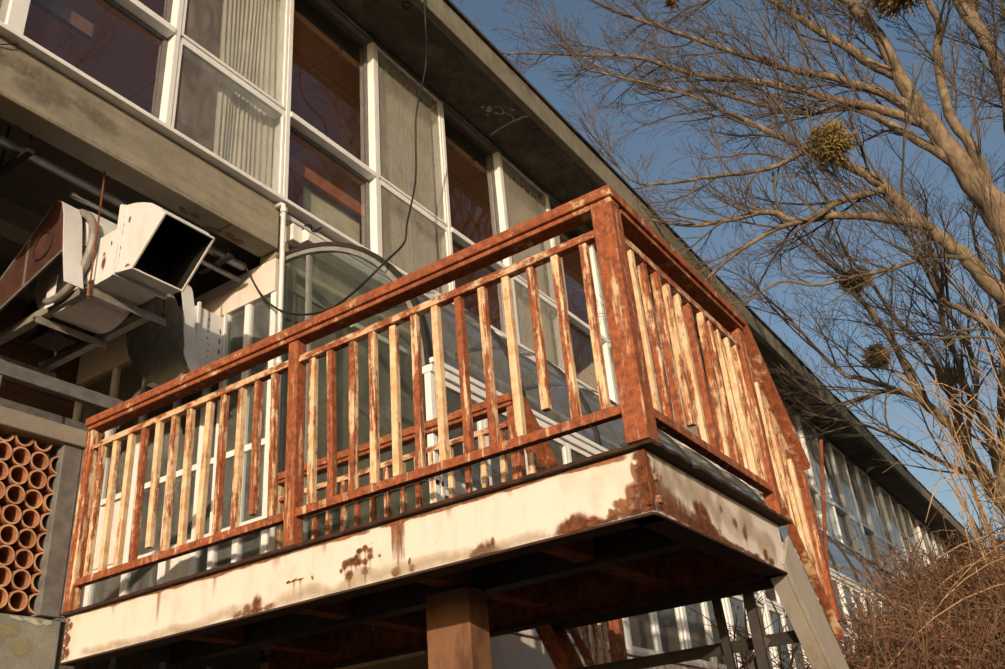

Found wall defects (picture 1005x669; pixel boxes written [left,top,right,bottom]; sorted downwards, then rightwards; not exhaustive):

rust [84,530,381,613]
rust [381,450,774,576]